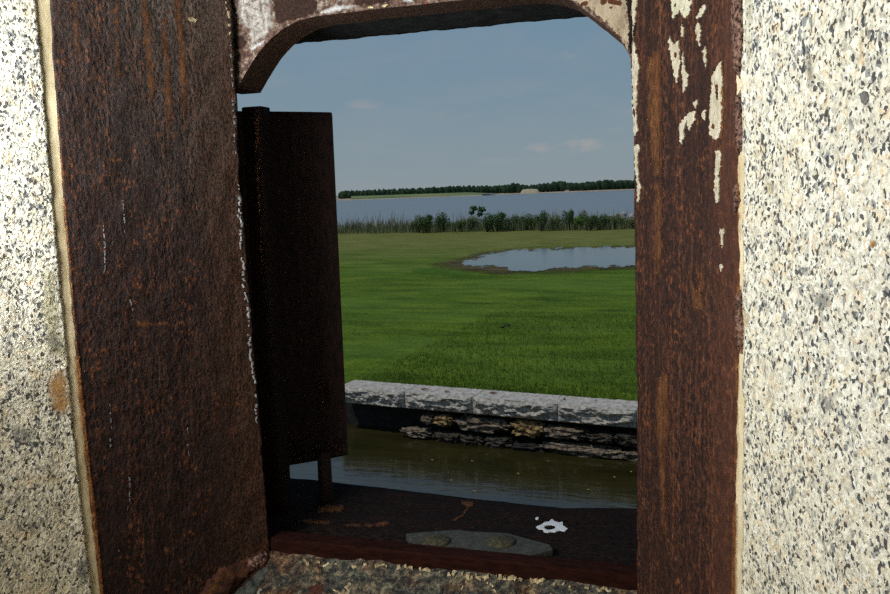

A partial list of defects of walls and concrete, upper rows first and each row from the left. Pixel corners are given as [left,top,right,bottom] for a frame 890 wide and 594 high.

corrosion [162,0,186,127]
peeling [239,0,273,44]
corrosion [272,0,317,23]
peeling [573,0,642,202]
corrosion [647,53,662,274]
peeling [668,0,724,203]
corrosion [49,357,103,594]
corrosion [655,374,669,533]